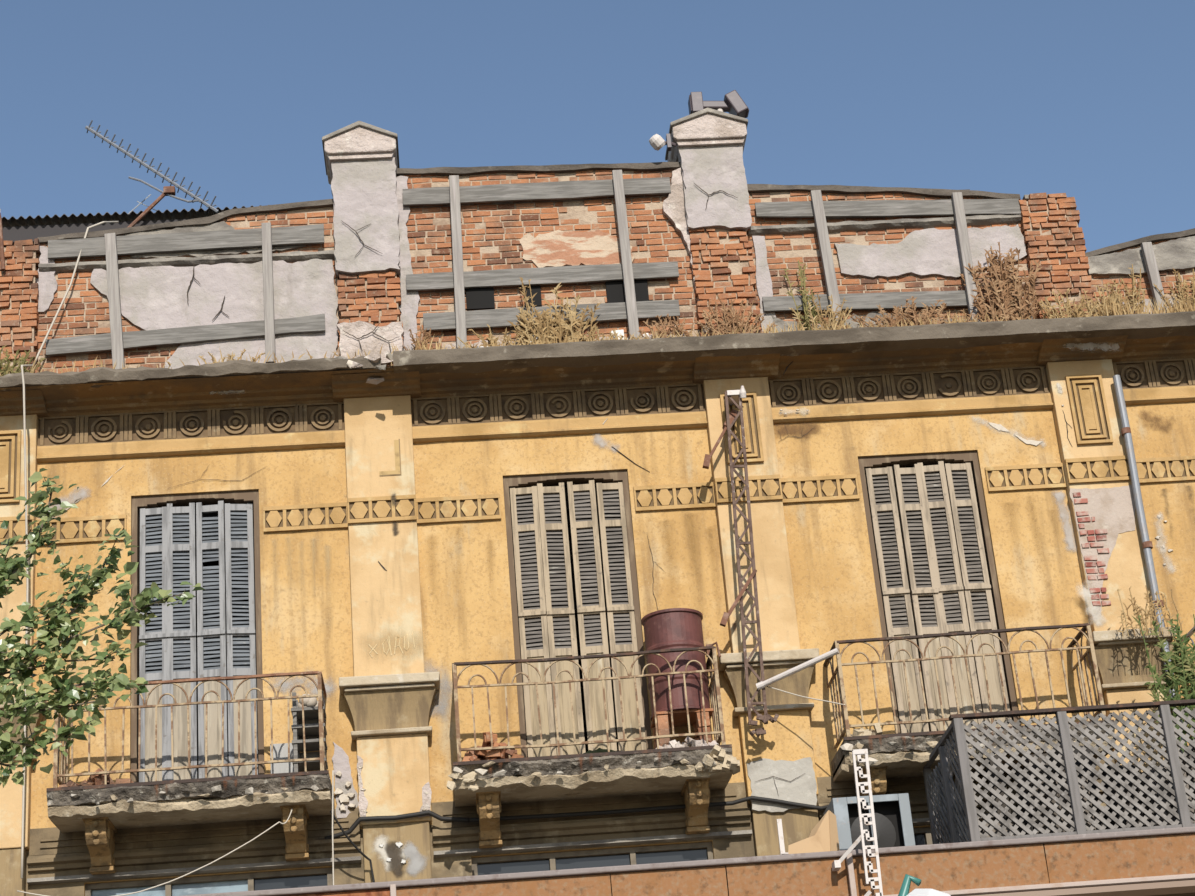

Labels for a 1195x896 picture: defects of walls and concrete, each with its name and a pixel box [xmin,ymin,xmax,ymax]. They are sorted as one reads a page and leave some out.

crack [187,267,229,321]
peeling [982,421,1044,446]
flaking render [1055,485,1136,625]
flaking render [747,757,817,813]